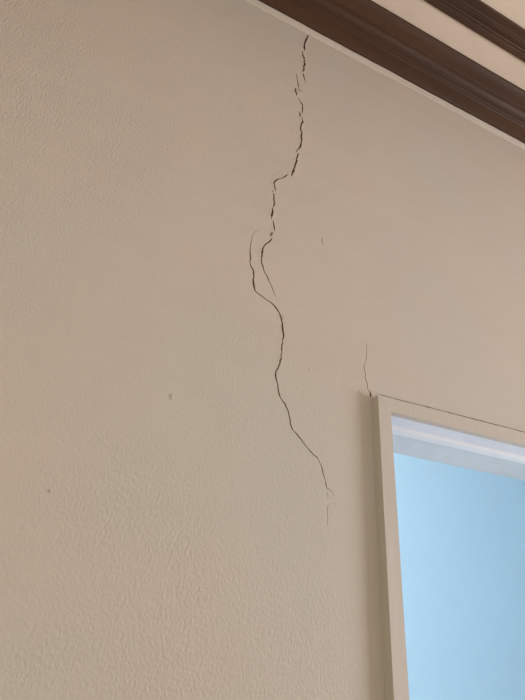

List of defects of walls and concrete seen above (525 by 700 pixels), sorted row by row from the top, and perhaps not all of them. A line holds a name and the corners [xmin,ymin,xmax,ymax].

crack [249,34,337,524]